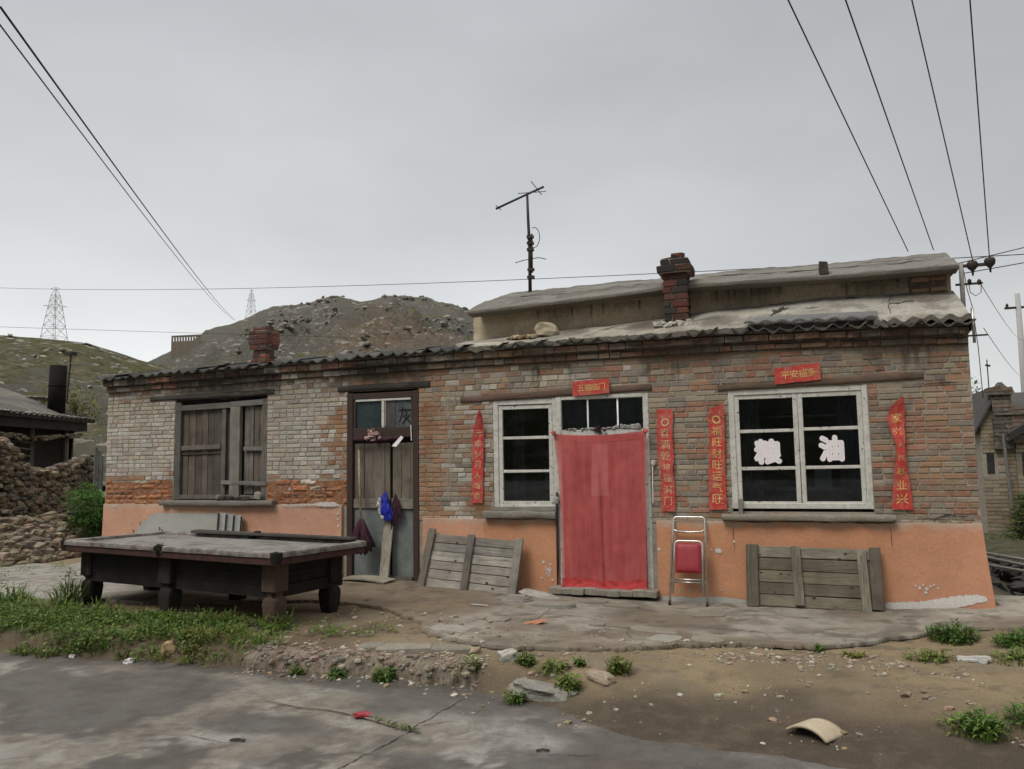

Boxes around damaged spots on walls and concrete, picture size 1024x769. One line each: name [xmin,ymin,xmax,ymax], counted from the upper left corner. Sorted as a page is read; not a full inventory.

spalling [105,480,231,534]